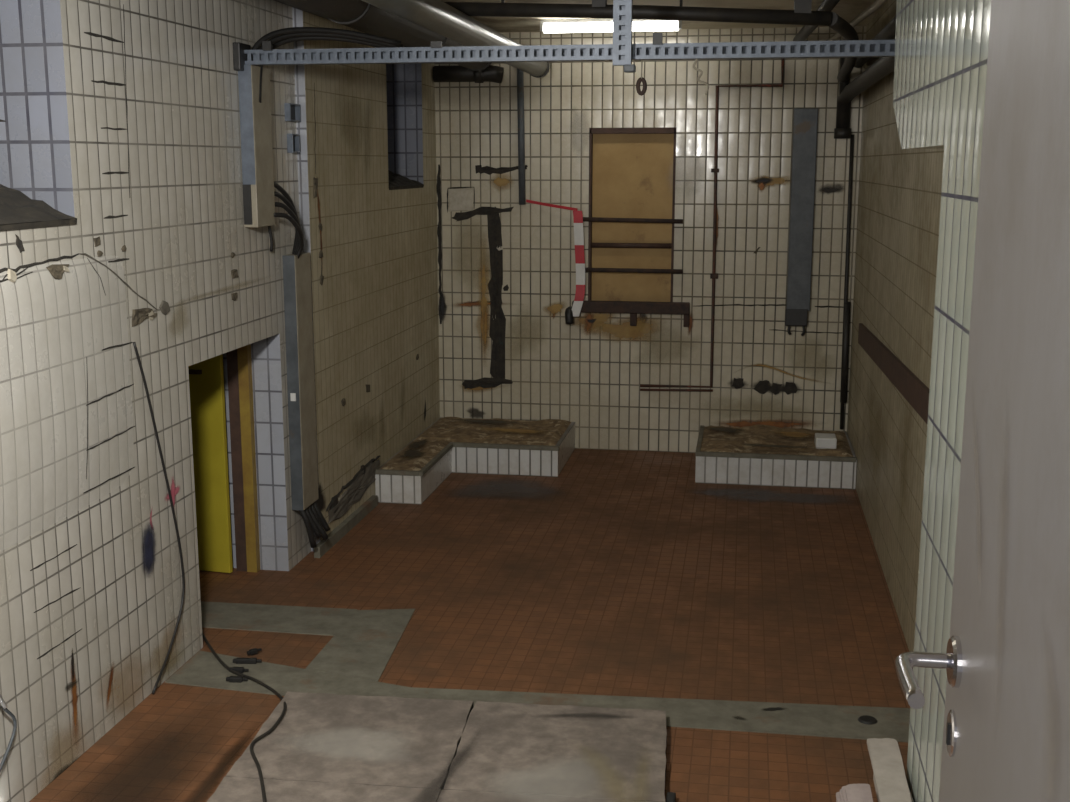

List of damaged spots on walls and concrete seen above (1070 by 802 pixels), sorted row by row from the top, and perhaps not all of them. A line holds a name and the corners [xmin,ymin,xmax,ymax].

crack [84,4,130,219]
crack [0,253,158,310]
corrosion [458,264,490,346]
corrosion [577,313,654,339]
spalling [326,455,380,524]
corrosion [66,650,78,732]